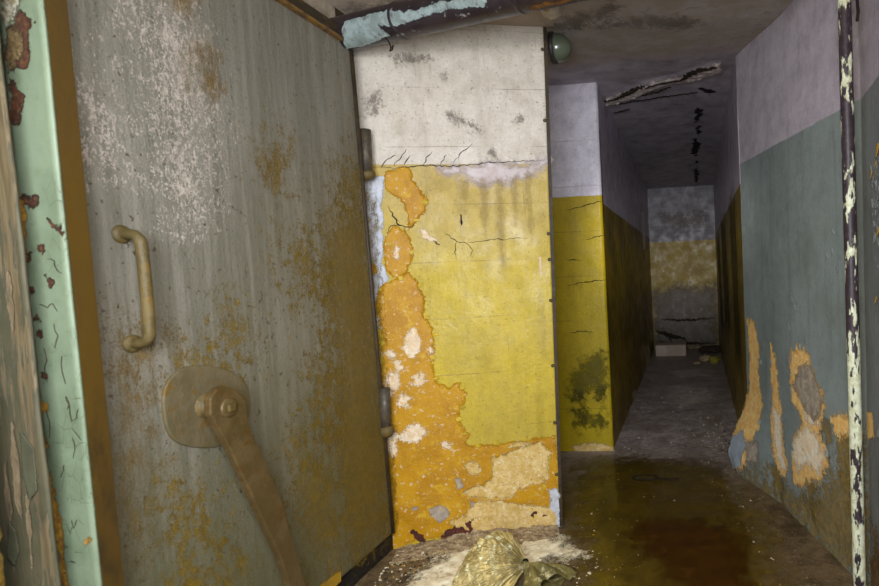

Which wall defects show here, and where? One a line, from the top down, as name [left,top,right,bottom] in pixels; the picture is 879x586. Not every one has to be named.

corrosion [0,0,36,126]
crack [373,144,544,169]
corrosion [19,193,45,264]
crack [386,207,415,234]
crack [447,214,527,257]
peeling [4,421,34,569]
peeling [365,166,562,549]
damp [565,349,611,429]
spalling [571,441,615,451]
damp [554,415,853,586]
peeling [728,317,849,490]
damp [862,434,871,586]